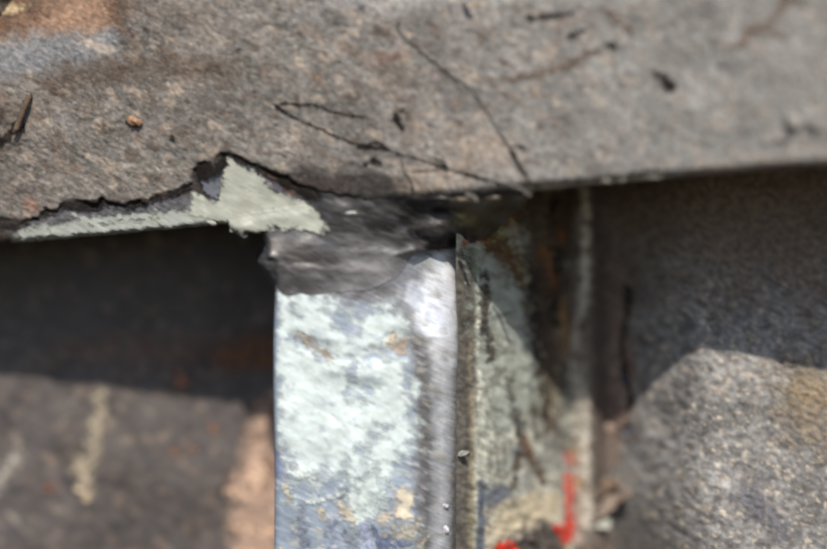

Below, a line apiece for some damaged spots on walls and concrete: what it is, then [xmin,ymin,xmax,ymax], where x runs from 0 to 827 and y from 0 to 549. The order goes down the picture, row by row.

crack [0,94,32,148]
peeling [0,152,330,238]
crack [274,23,530,192]
peeling [275,292,428,549]